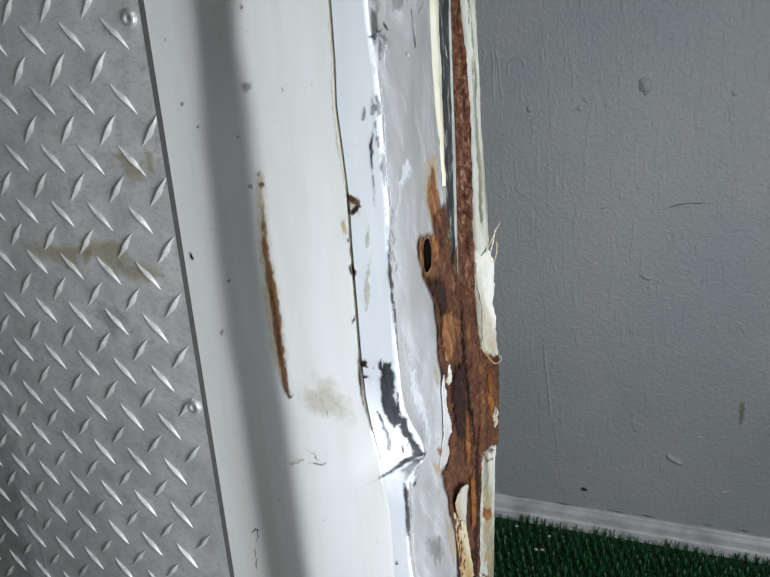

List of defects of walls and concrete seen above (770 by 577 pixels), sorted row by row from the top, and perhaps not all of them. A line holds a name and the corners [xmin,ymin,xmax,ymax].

peeling [380,87,411,220]
rust [262,215,292,398]
peeling [404,349,452,469]
rust [419,168,500,577]
peeling [475,221,502,364]
peeling [454,484,474,577]